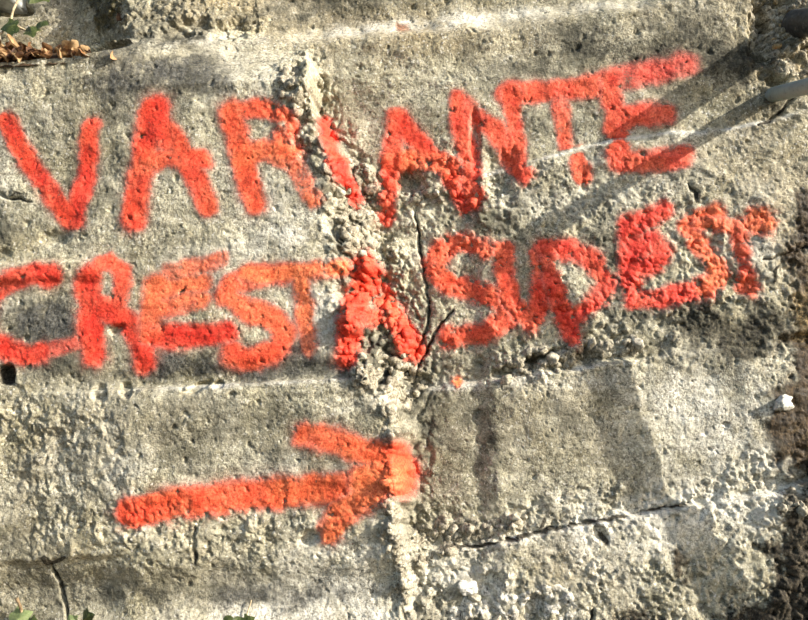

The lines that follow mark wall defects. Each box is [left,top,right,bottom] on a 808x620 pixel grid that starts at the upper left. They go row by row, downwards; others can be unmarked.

crack [406,213,454,372]
damp [766,189,808,485]
crack [39,556,66,586]
crack [447,502,689,548]